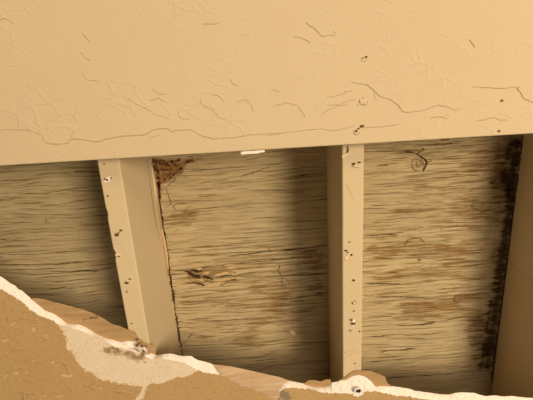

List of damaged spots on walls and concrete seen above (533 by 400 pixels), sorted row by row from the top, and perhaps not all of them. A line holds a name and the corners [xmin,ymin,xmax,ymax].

crack [23,90,353,145]
crack [322,81,463,128]
crack [474,86,533,102]
rust [152,156,195,197]
spalling [185,266,238,287]
crack [146,158,326,356]
leakage [367,138,522,370]
peeling [0,276,222,400]
spalling [279,375,533,400]